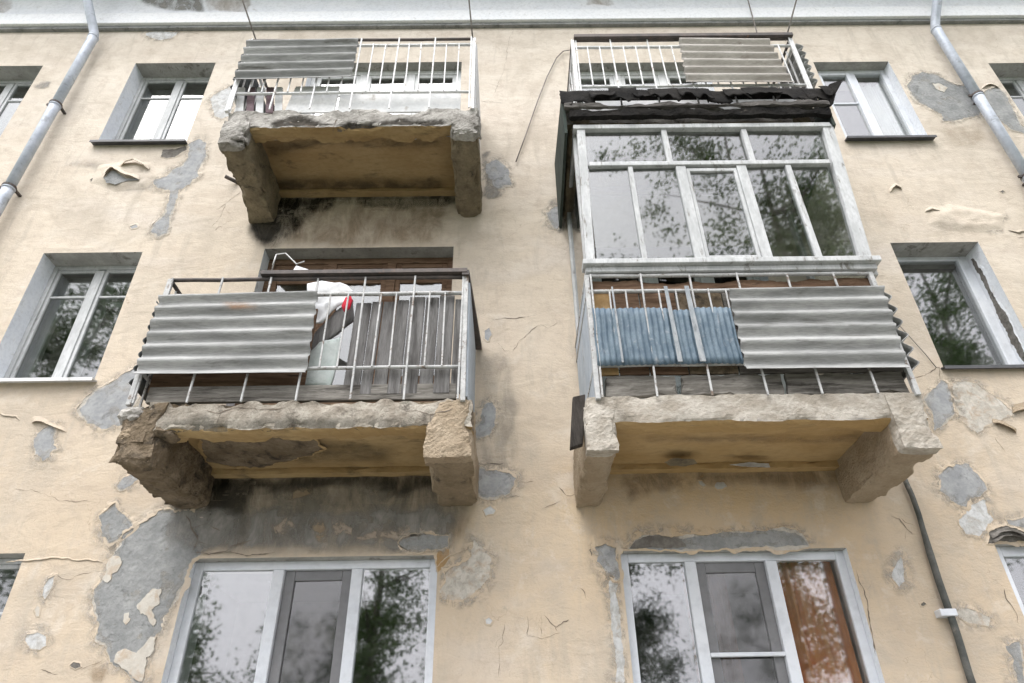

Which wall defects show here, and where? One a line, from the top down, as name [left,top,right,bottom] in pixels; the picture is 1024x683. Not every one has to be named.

peeling [903,71,1024,134]
peeling [90,137,210,240]
damp [250,182,455,244]
peeling [921,378,1024,436]
damp [169,476,456,551]
peeling [477,464,521,517]
peeling [935,460,1024,543]
peeling [87,466,206,683]
peeling [397,528,495,607]
crack [496,615,568,667]
spalling [587,524,812,683]